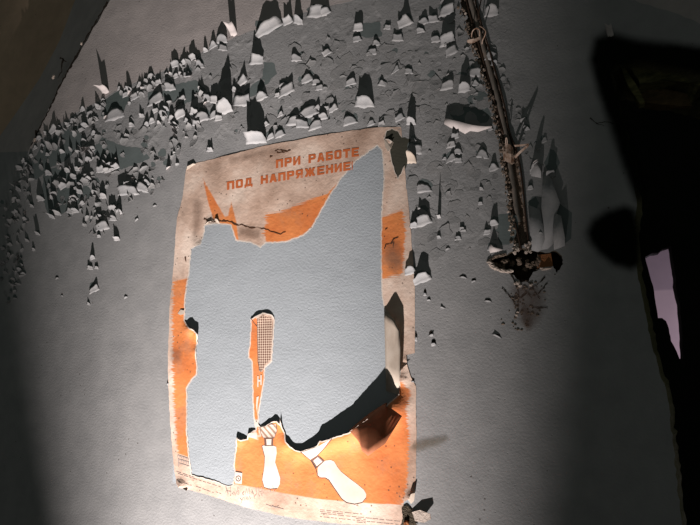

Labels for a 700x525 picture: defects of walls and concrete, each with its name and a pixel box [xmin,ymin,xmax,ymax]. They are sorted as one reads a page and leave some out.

peeling [0,0,572,331]